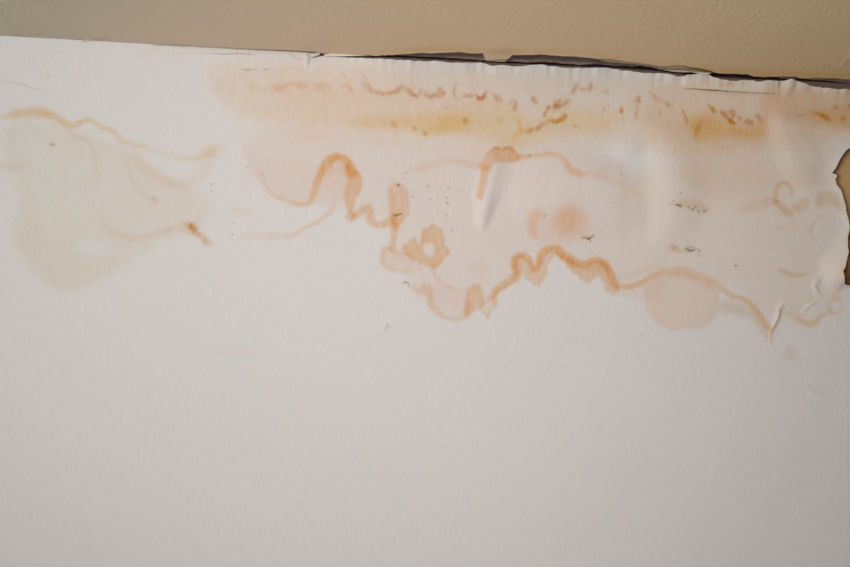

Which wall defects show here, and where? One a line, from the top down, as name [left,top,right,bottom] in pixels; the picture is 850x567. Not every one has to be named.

leakage [0,37,850,364]
peeling [833,148,850,285]